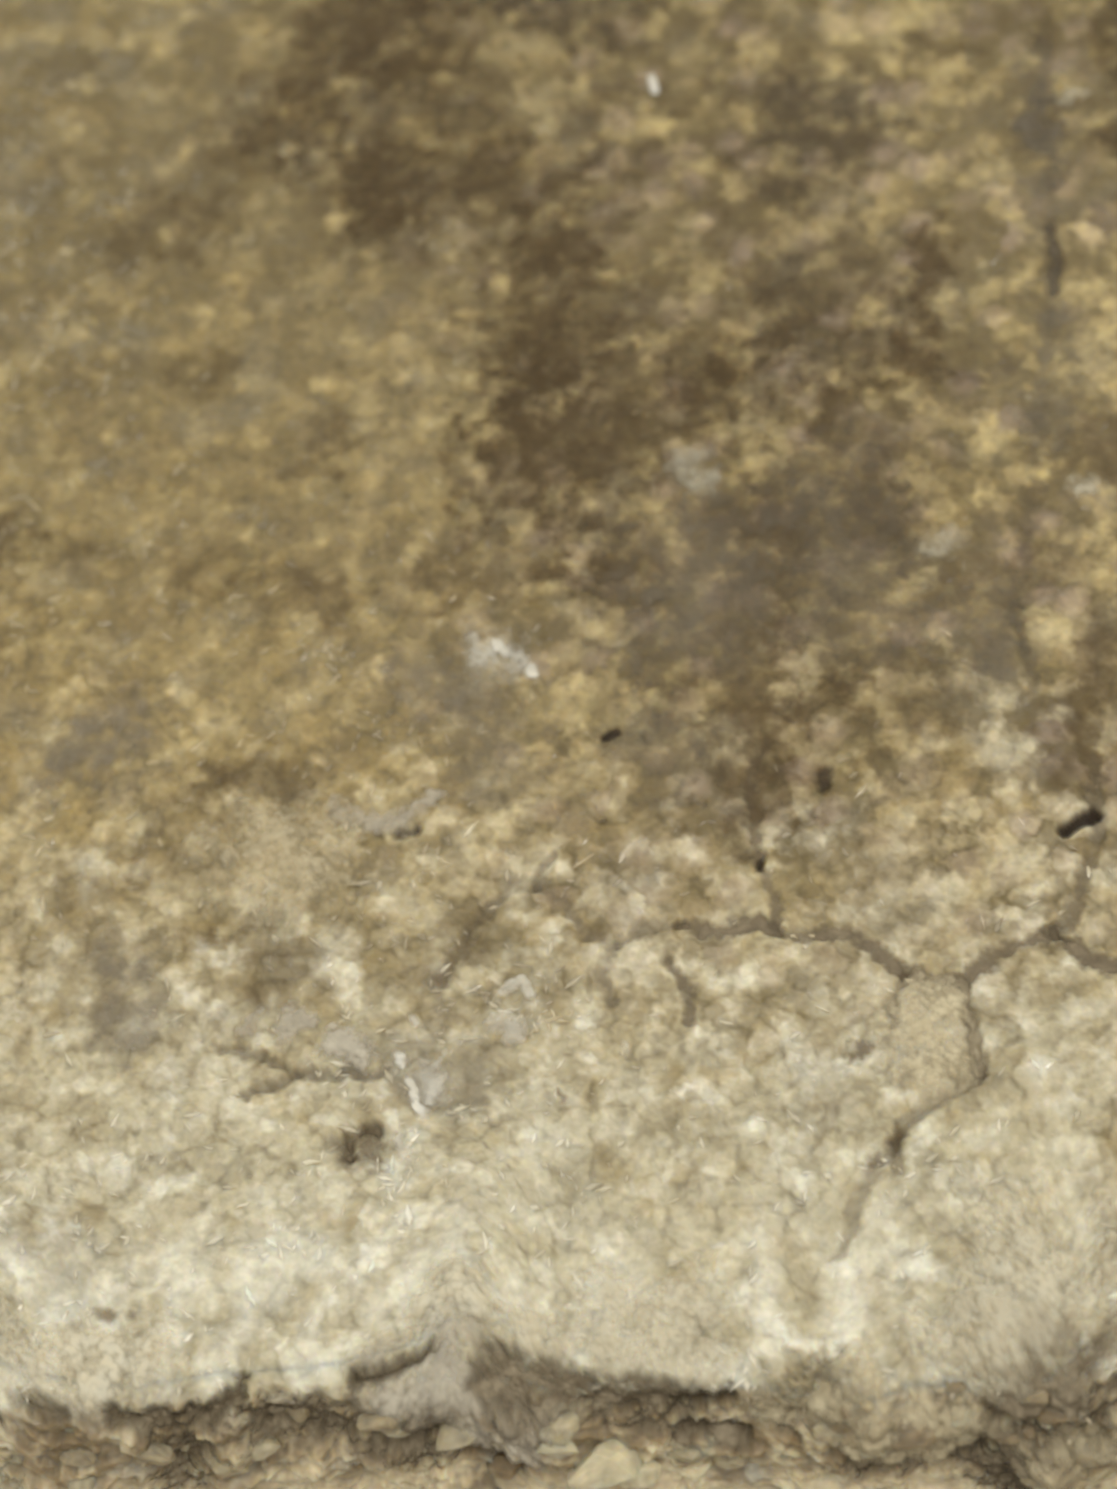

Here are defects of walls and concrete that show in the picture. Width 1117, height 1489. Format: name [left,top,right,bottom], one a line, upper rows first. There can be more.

damp [891,215,951,376]
damp [533,560,629,590]
crack [665,739,1117,1081]
spalling [0,1319,1117,1489]